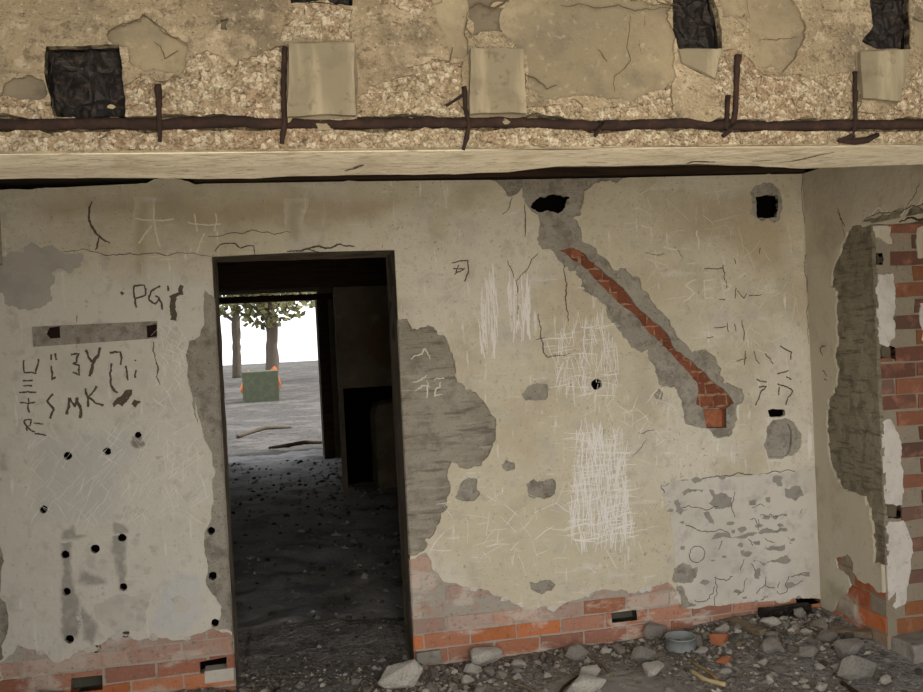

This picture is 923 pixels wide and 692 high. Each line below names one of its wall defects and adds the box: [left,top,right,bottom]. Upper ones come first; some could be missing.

spalling [0,0,923,151]
peeling [0,243,83,310]
flaking render [0,291,237,692]
peeling [364,316,821,667]
flaking render [491,178,743,438]
flaking render [833,555,898,650]
flaking render [827,206,923,565]
crack [837,183,923,236]